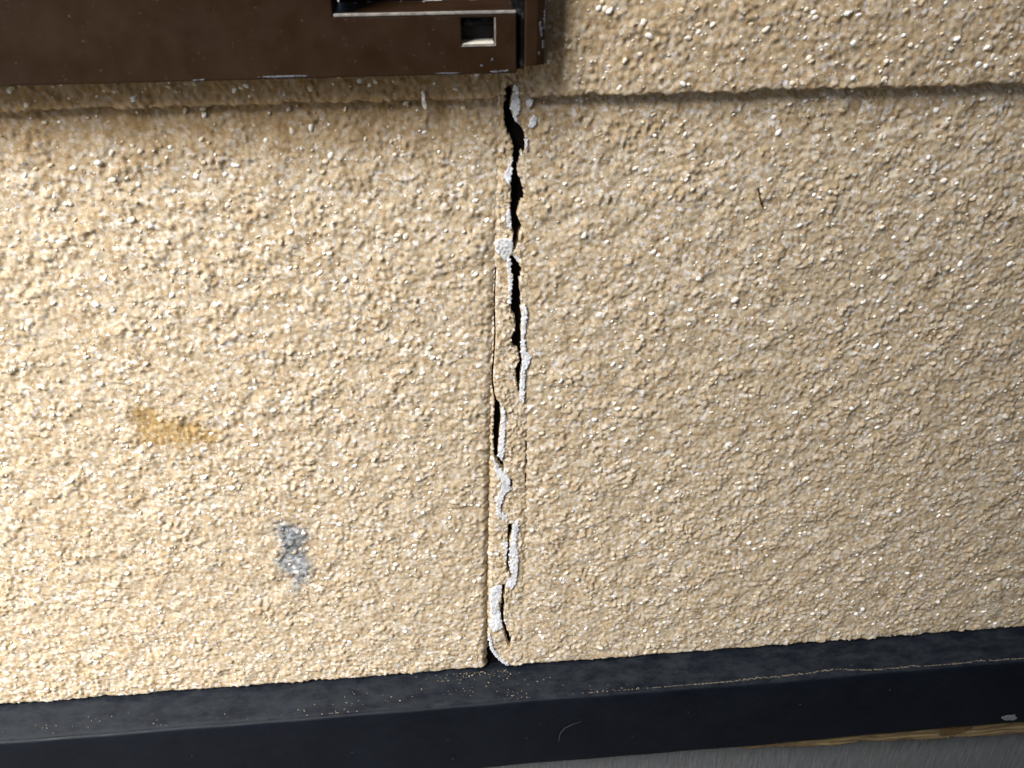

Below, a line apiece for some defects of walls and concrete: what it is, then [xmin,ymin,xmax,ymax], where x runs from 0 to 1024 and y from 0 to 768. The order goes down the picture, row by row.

crack [487,84,532,666]